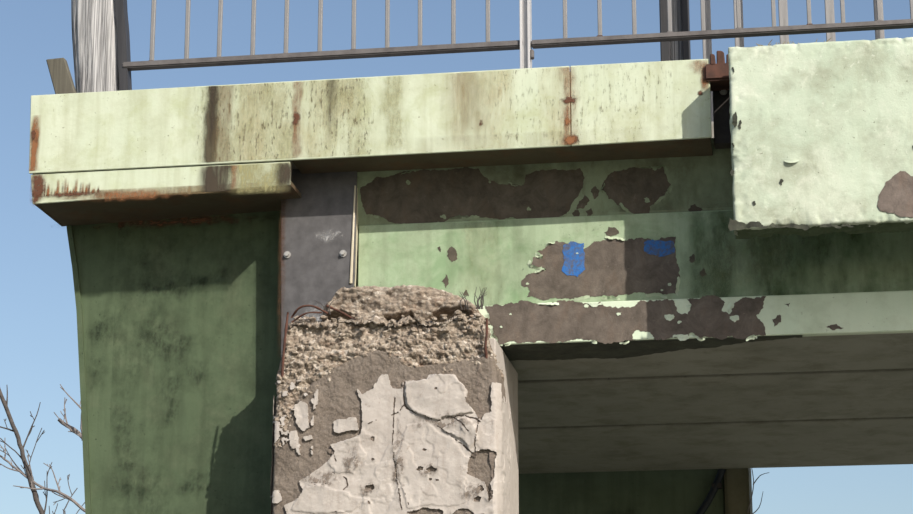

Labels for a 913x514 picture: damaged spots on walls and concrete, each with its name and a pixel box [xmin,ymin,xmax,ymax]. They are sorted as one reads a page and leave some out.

corrosion [29,118,167,203]
corrosion [178,186,205,194]
leakage [203,85,284,192]
peeling [360,165,673,224]
corrosion [563,67,578,145]
peeling [877,171,913,218]
spalling [270,227,802,514]
crack [321,449,348,490]
crack [368,366,495,514]